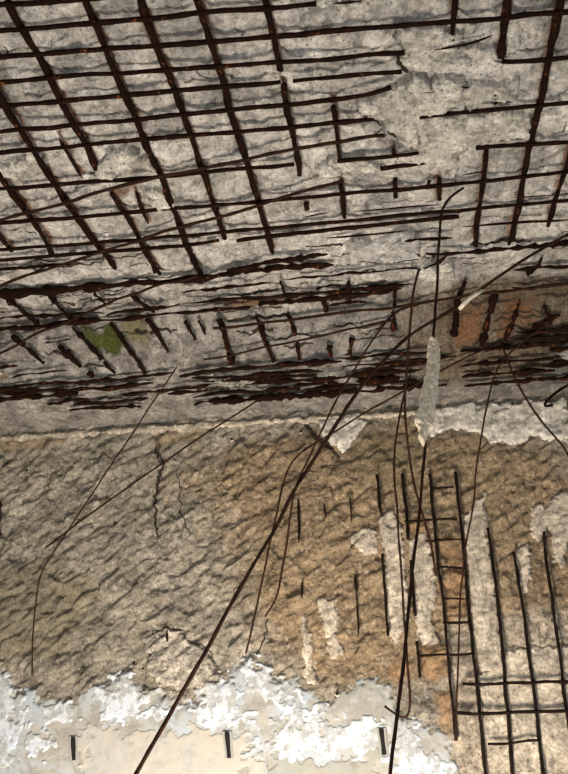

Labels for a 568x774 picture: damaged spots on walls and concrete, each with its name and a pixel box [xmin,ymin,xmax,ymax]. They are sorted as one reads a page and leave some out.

spalling [315,0,380,12]
spalling [0,18,537,287]
rust [456,310,481,342]
crack [152,431,191,537]
peeling [0,187,568,774]